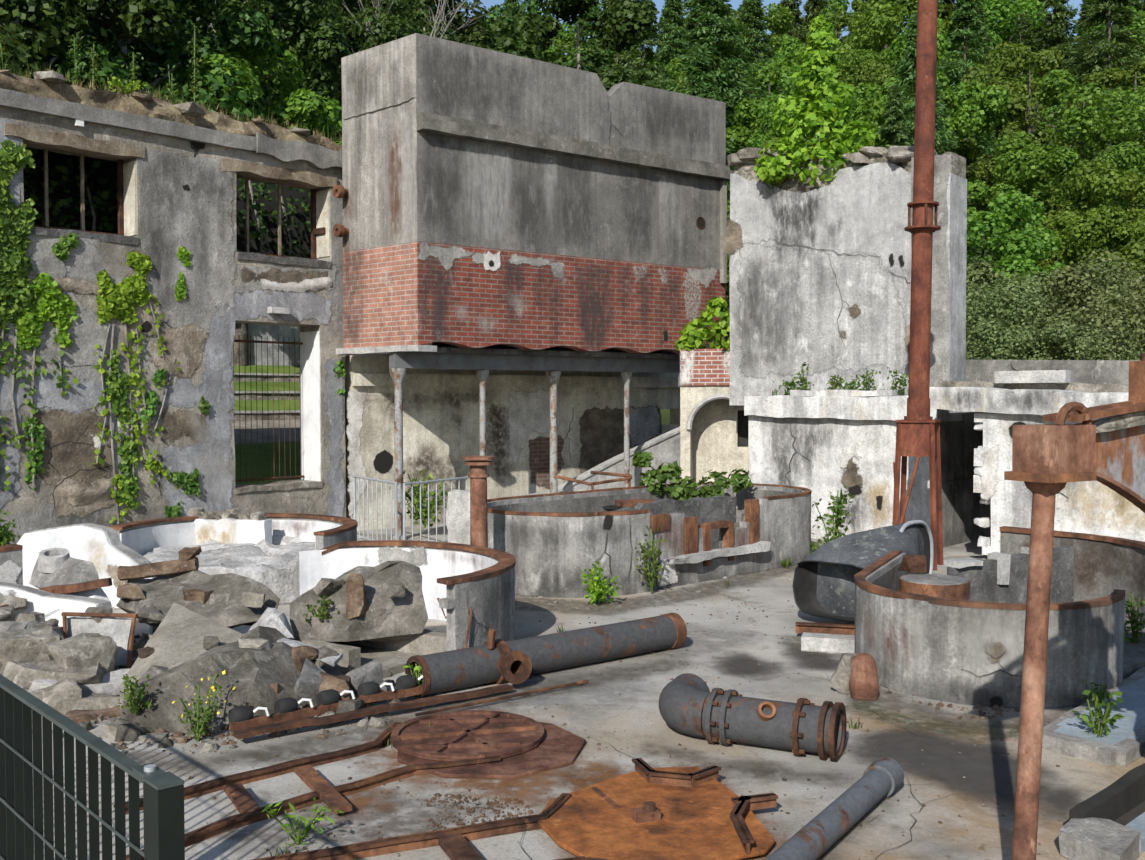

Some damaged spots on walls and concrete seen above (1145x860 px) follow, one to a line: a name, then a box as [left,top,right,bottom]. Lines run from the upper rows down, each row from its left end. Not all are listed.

spalling [241,267,333,293]
peeling [683,271,701,322]
peeling [722,220,910,379]
crack [30,426,116,516]
peeling [503,389,564,489]
crack [785,422,812,486]
spalling [840,451,862,497]